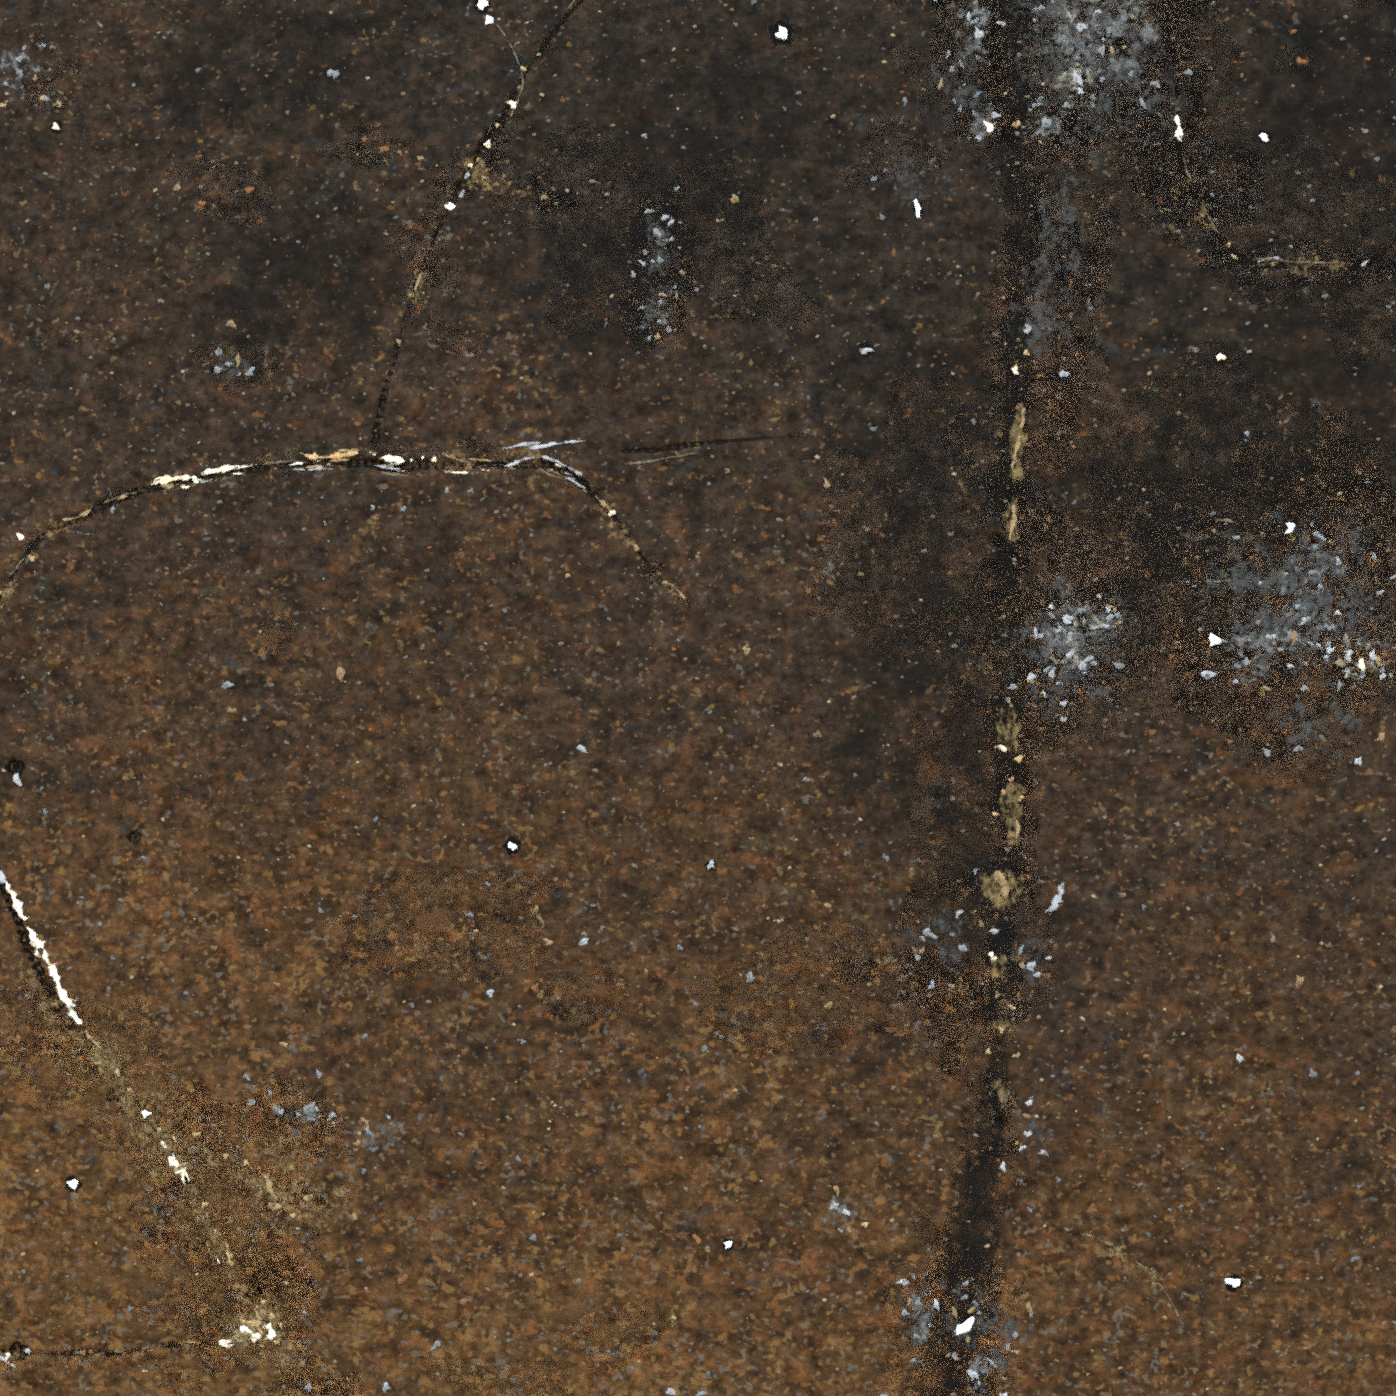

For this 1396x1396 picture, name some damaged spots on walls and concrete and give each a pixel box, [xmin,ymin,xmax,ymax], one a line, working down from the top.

leakage [933,0,1193,144]
rust [173,154,227,206]
rust [362,136,402,156]
crack [408,0,583,302]
crack [0,333,685,608]
crack [621,437,768,465]
rust [531,905,636,999]
leakage [915,907,968,961]
leakage [1011,941,1034,984]
crack [0,870,352,1396]
leakage [1015,1099,1048,1156]
leakage [895,1274,1033,1393]